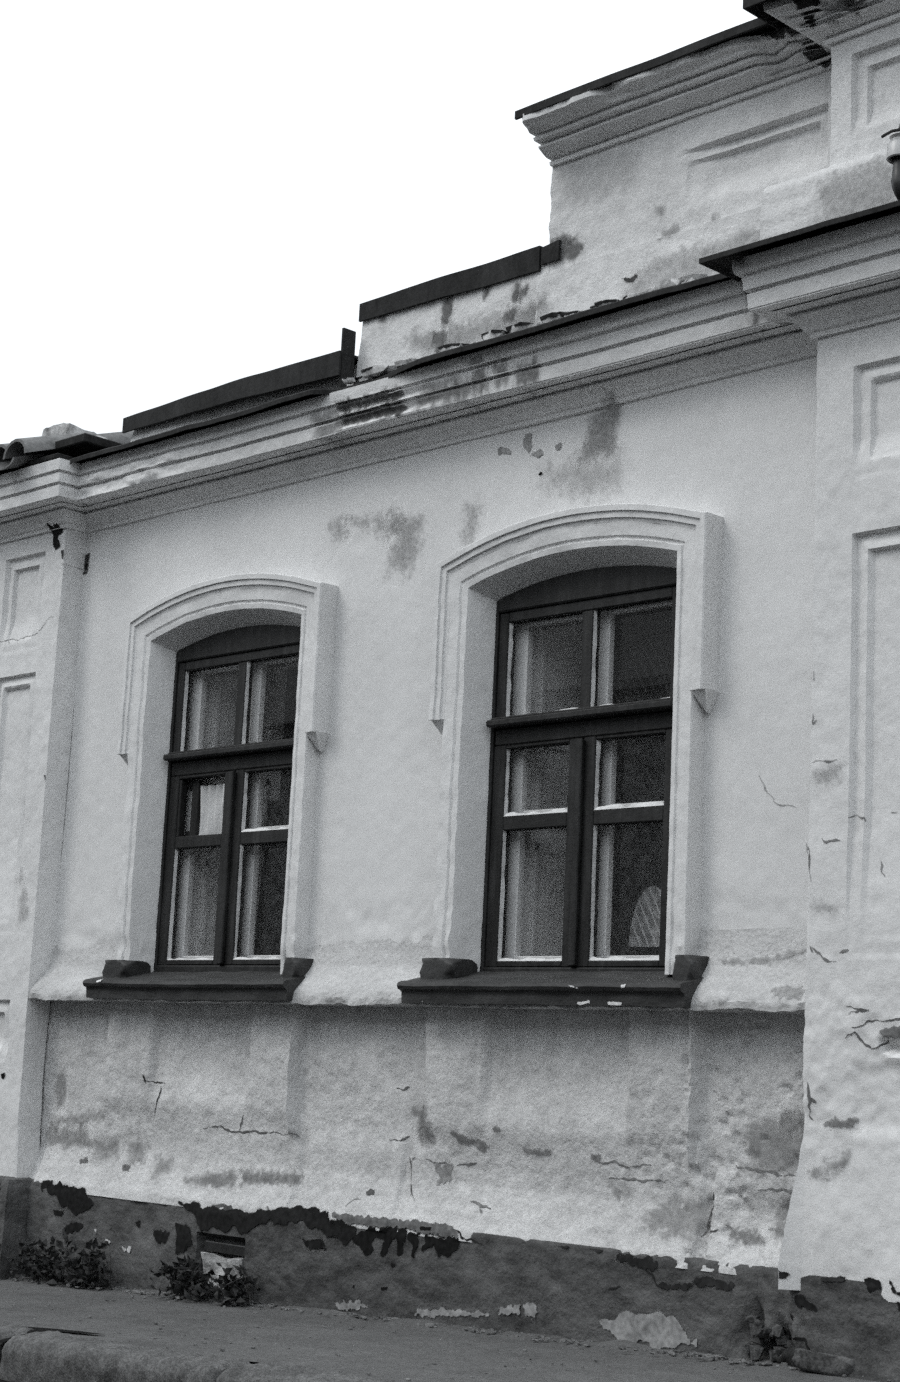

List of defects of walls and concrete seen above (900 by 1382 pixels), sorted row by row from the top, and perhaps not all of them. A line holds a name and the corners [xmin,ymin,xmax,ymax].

flaking render [761,0,831,69]
leakage [551,235,583,260]
leakage [582,396,619,456]
crack [806,812,897,880]
crack [845,1006,900,1049]
crack [203,1116,300,1137]
flaking render [450,1126,500,1152]
peeling [40,1180,131,1253]
peeling [135,1201,459,1268]
flaking render [593,1249,734,1291]
flaking render [415,1302,538,1320]
flaking render [599,1311,697,1348]